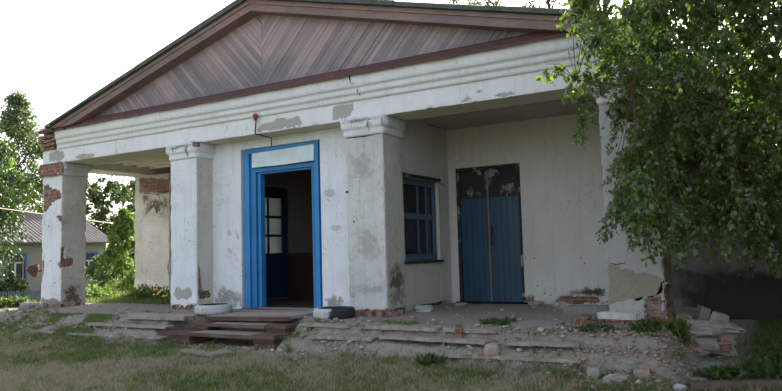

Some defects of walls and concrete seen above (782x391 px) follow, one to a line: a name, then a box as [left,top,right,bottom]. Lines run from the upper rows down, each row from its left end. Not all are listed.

flaking render [257,116,303,133]
flaking render [333,103,353,120]
flaking render [39,134,95,213]
flaking render [139,177,170,193]
flaking render [42,247,73,275]
flaking render [537,263,672,320]